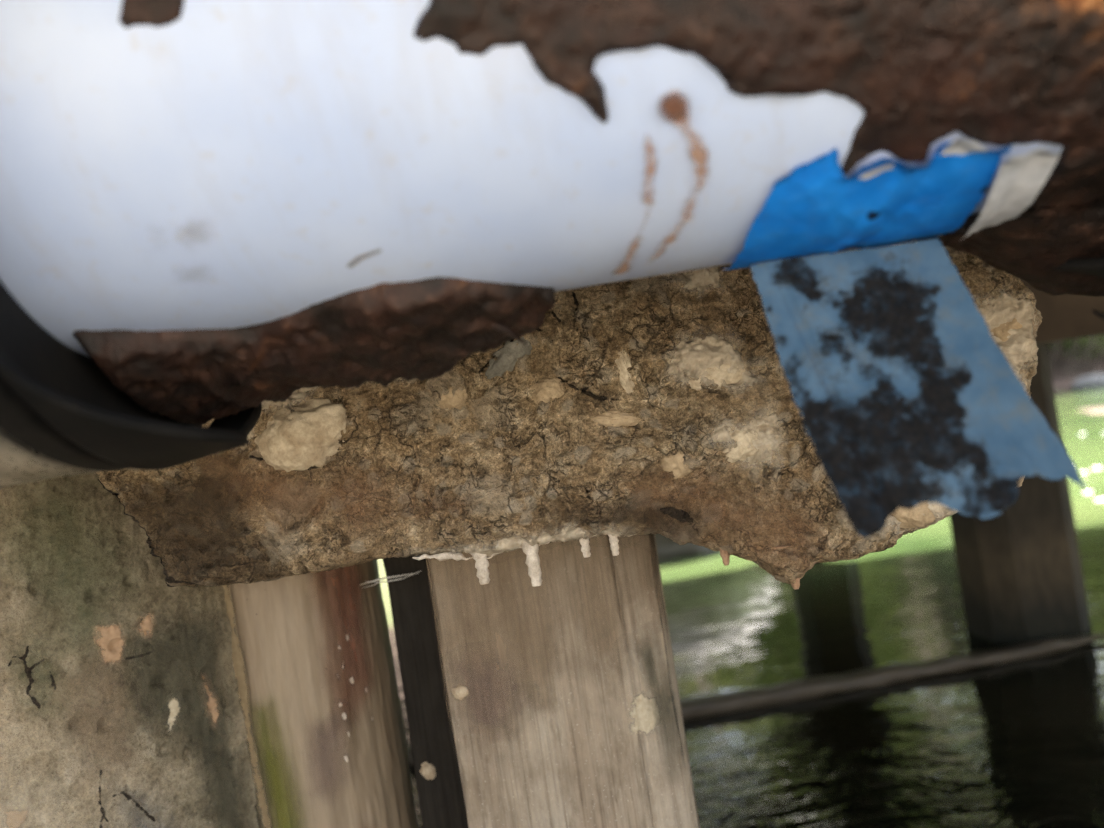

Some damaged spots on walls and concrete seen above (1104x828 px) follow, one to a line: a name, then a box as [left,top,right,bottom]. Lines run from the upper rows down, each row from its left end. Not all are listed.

rust [119,0,184,28]
rust [414,0,1104,212]
rust [613,238,639,274]
rust [654,202,694,258]
leakage [412,507,673,720]